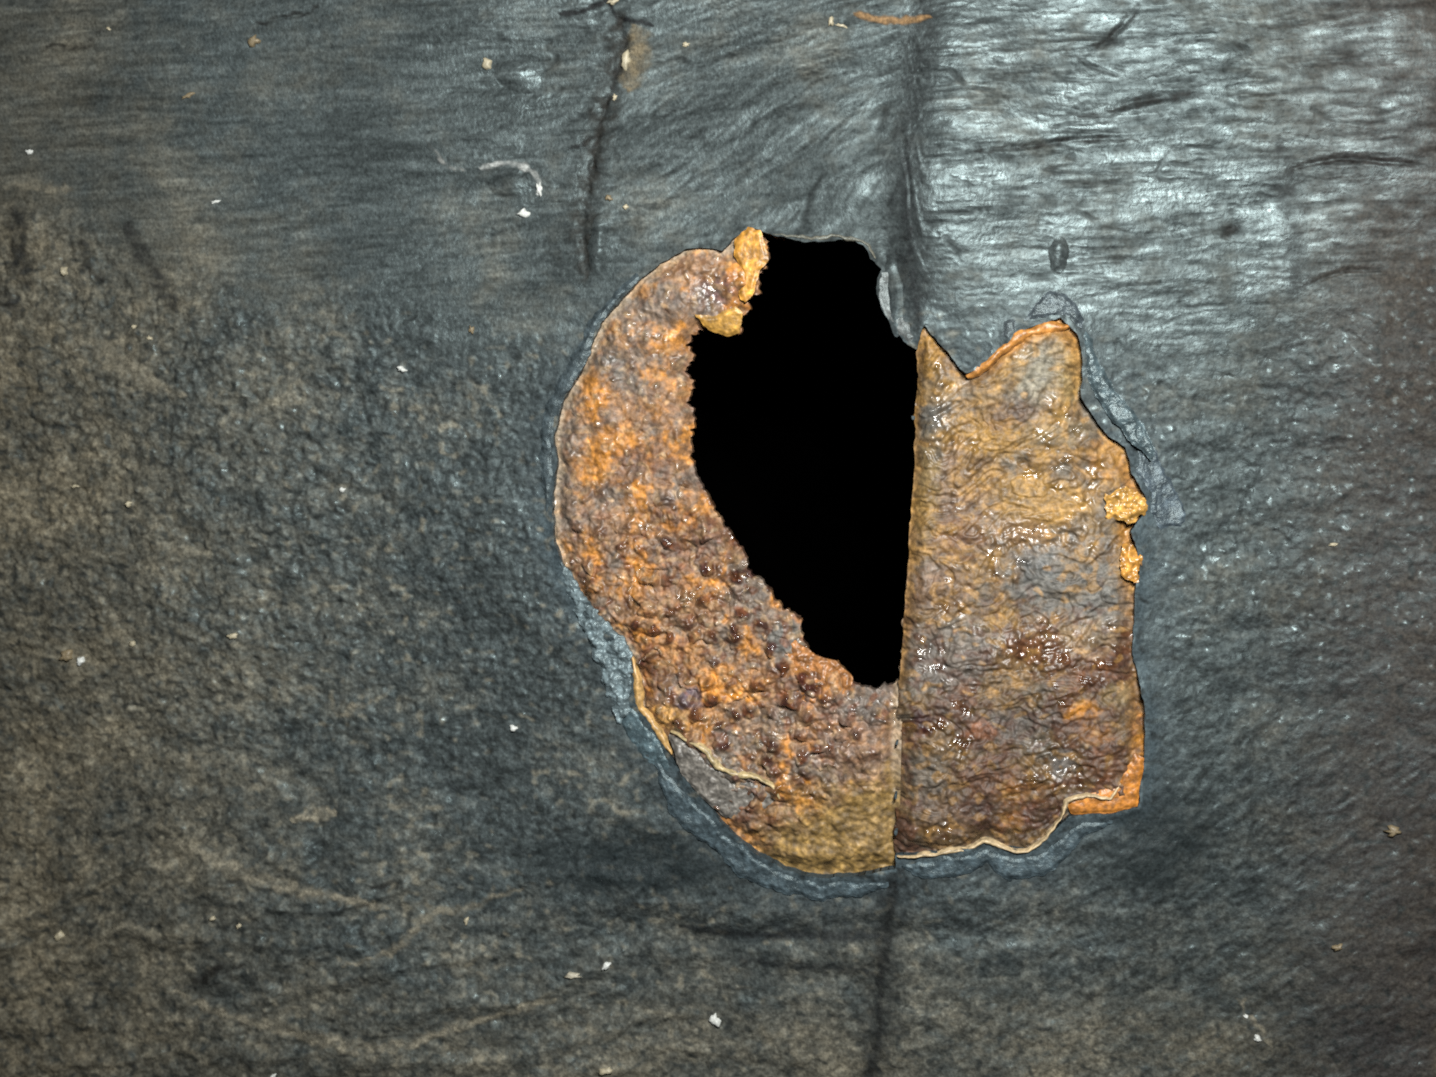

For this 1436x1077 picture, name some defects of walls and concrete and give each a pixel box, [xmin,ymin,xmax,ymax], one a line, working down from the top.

crack [559,0,654,26]
crack [572,67,620,189]
peeling [774,233,913,343]
corrosion [554,227,1148,874]